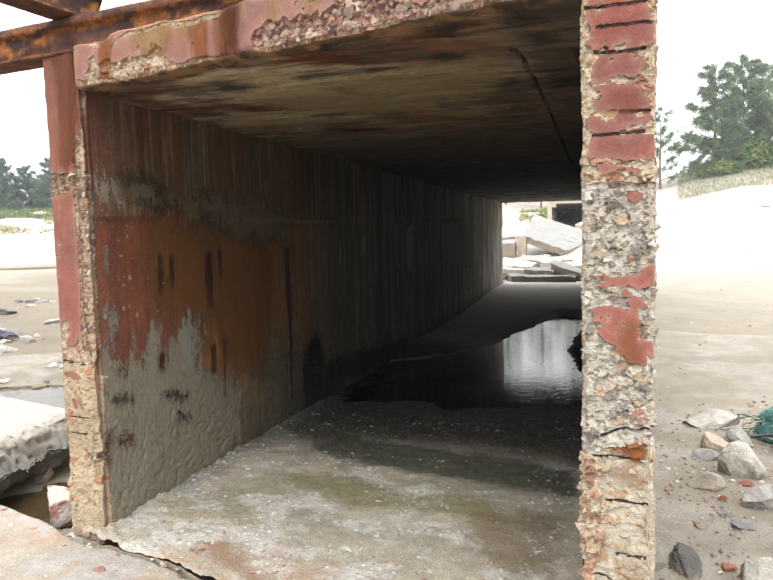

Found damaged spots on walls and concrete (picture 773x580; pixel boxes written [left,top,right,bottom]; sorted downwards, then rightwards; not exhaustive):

rust [190,8,236,58]
spalling [252,0,489,50]
rust [99,42,111,81]
crack [509,47,580,174]
peeling [50,42,250,544]
spalling [574,0,662,580]
damp [300,331,408,408]
crack [593,425,654,463]
crack [606,498,652,506]
crack [150,558,190,580]
crack [615,552,646,560]